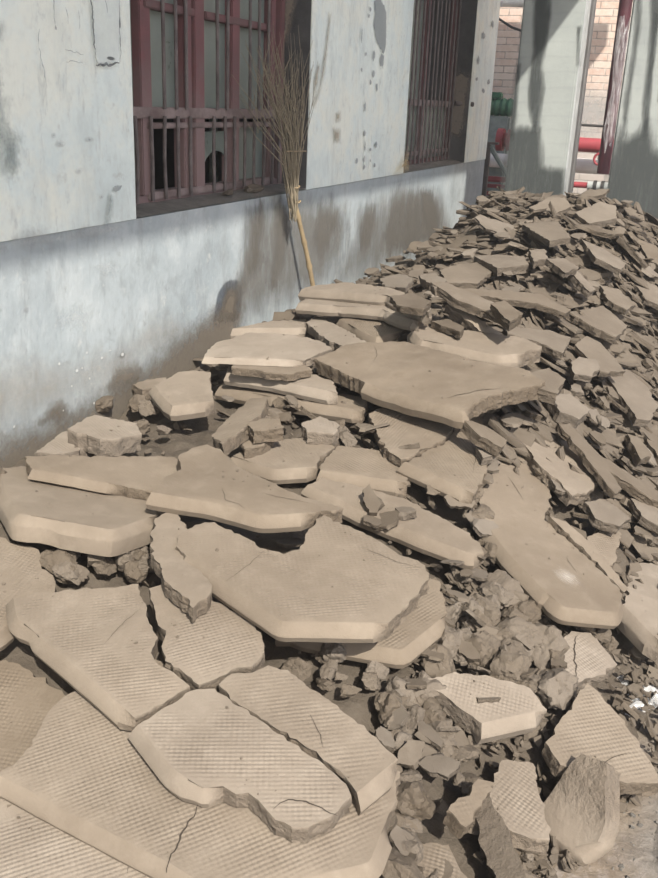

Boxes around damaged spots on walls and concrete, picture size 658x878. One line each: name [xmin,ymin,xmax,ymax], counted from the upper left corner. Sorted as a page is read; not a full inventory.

peeling [361,0,386,92]
water stain [502,0,564,195]
water stain [582,101,605,123]
water stain [606,0,658,219]
water stain [237,206,342,304]
water stain [346,193,443,271]